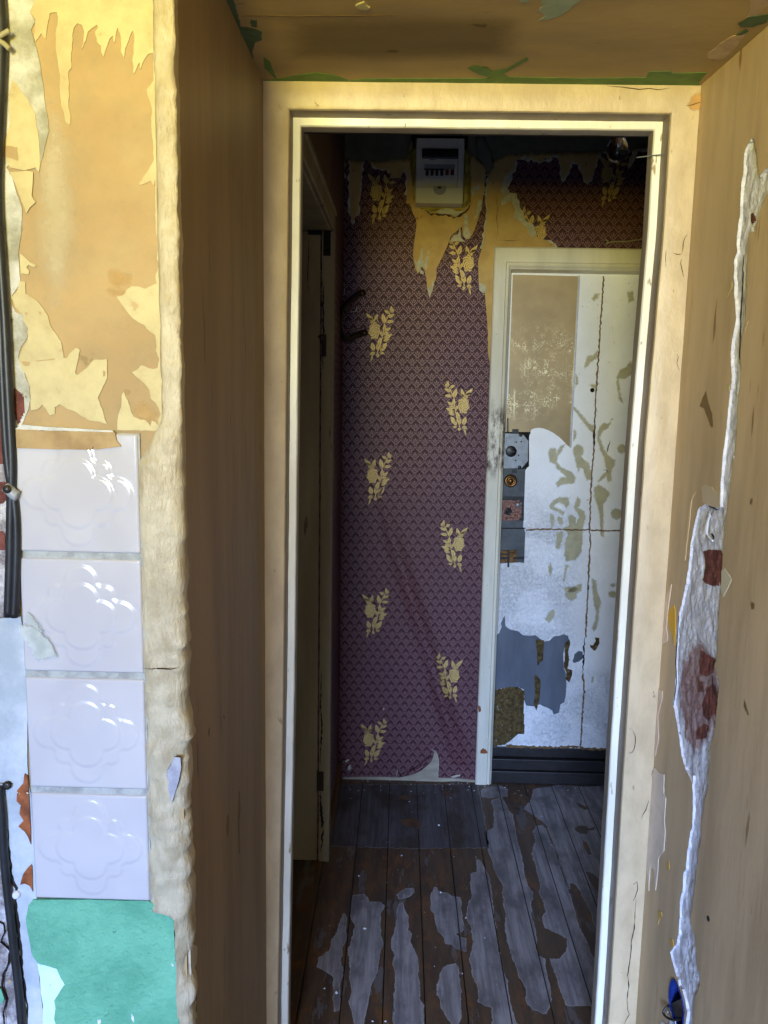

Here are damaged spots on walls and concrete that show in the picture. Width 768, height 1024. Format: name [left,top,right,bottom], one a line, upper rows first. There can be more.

flaking render [3,0,162,431]
flaking render [0,428,65,1024]
peeling [646,688,670,891]
peeling [662,584,676,645]
flaking render [696,651,718,739]
flaking render [702,549,732,596]
peeling [317,784,604,1024]